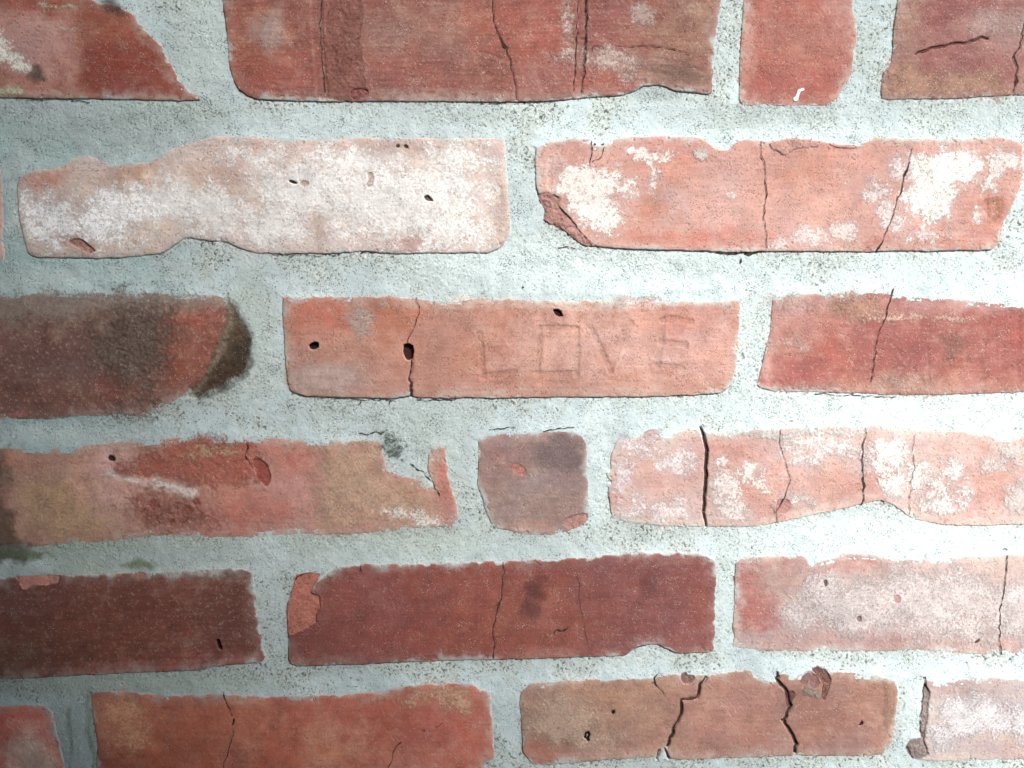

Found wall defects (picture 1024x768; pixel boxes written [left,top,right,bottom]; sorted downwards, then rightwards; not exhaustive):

damp [9,128,524,264]
spalling [537,193,591,246]
efflorescence [544,147,679,242]
efflorescence [760,220,860,251]
crack [876,149,912,251]
efflorescence [860,144,1024,246]
crack [700,428,709,521]
damp [607,429,1024,530]
spalling [288,572,320,635]
crack [999,555,1008,655]
crack [654,674,705,759]
crack [775,675,797,752]